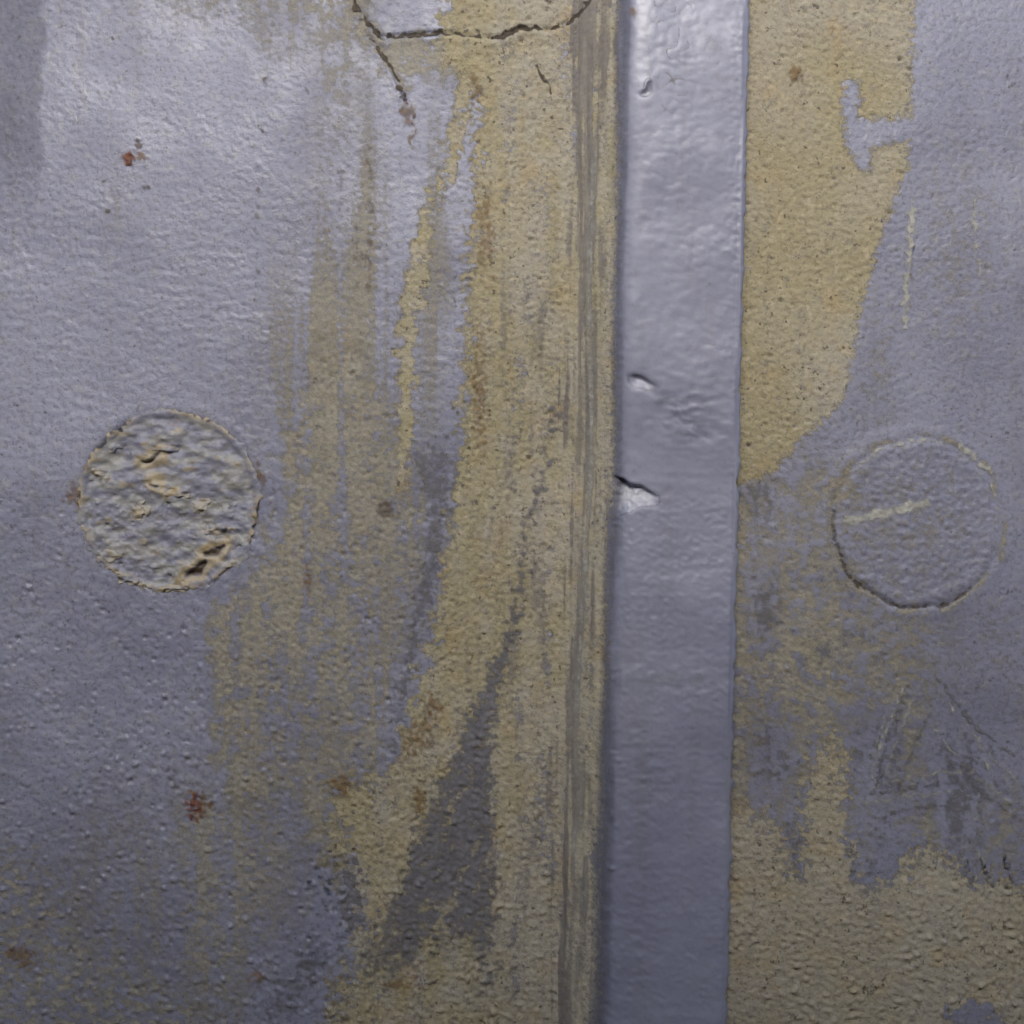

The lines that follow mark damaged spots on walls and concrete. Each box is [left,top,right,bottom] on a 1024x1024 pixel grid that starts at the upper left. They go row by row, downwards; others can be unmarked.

peeling [68,0,660,1024]
crack [352,0,591,104]
peeling [725,0,1024,1024]